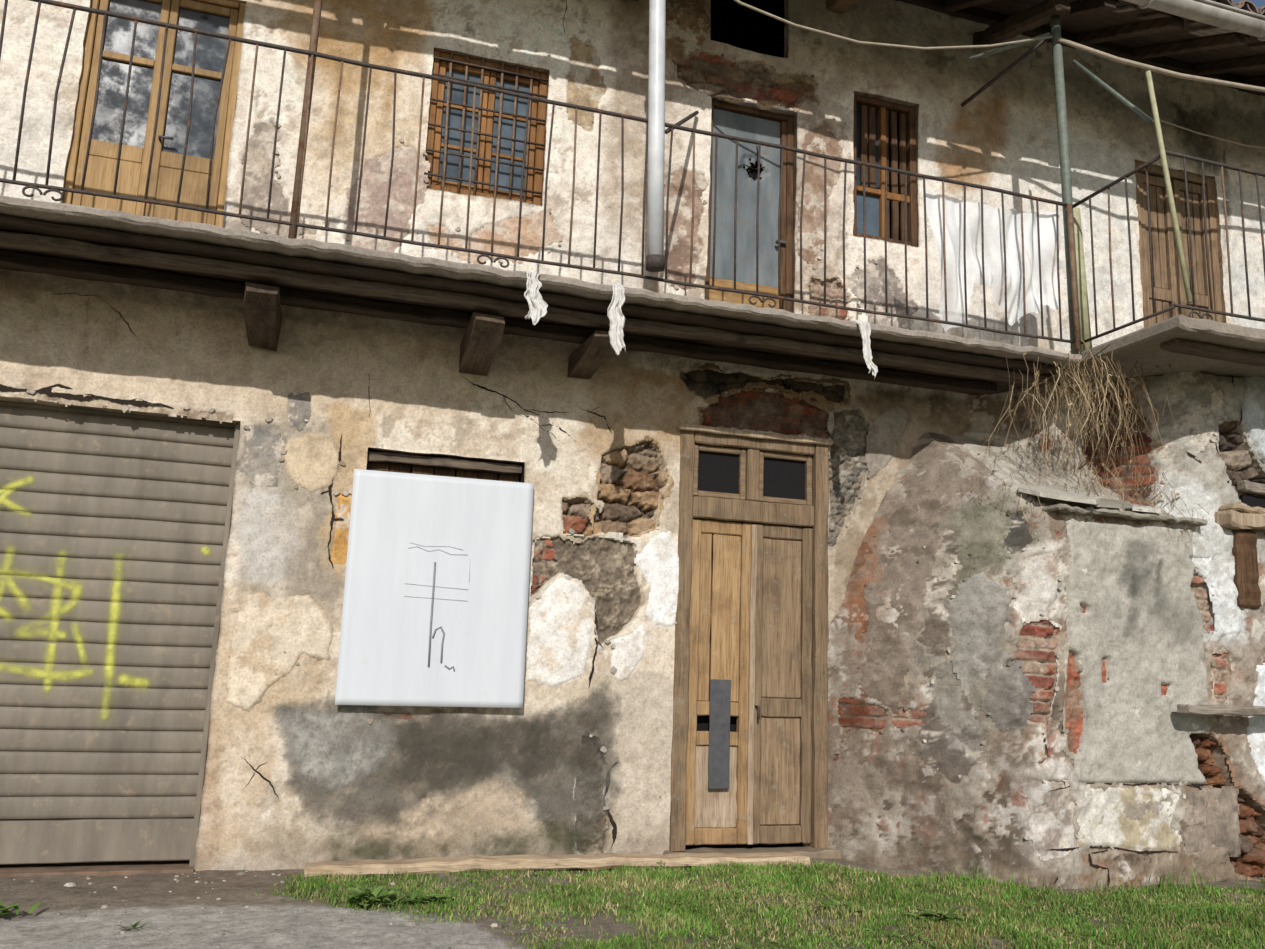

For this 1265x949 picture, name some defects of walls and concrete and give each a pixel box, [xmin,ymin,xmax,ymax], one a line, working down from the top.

spalling [664,0,918,330]
crack [0,384,173,408]
crack [458,372,611,442]
spalling [680,362,873,549]
spalling [528,435,674,653]
flaking render [833,528,987,782]
spalling [1002,510,1086,759]
spalling [1190,558,1217,635]
spalling [1210,648,1236,704]
water stain [277,686,619,849]
flaking render [1023,779,1078,861]
spalling [1189,730,1265,881]